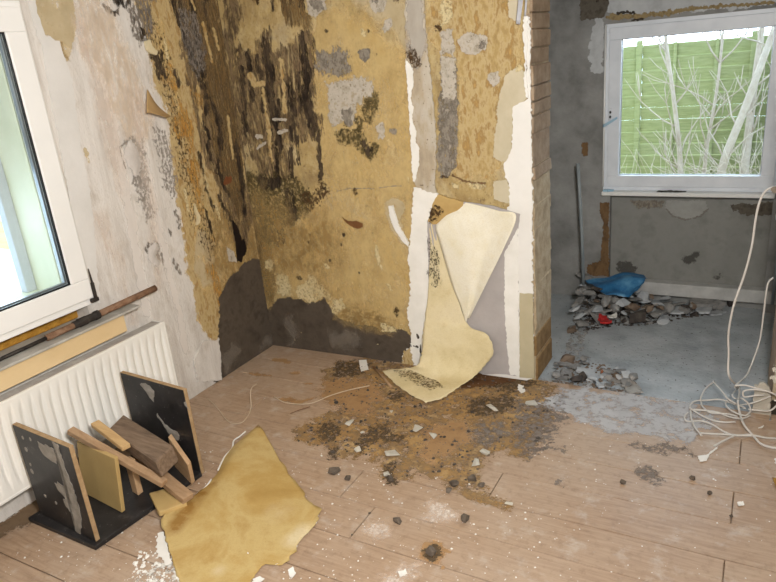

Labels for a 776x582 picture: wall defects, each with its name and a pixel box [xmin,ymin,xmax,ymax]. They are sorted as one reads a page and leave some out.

peeling [36,0,77,61]
spalling [357,48,370,63]
flaking render [579,0,775,22]
spalling [324,75,375,131]
damp [73,0,443,390]
peeling [433,0,535,380]
spalling [768,308,776,409]